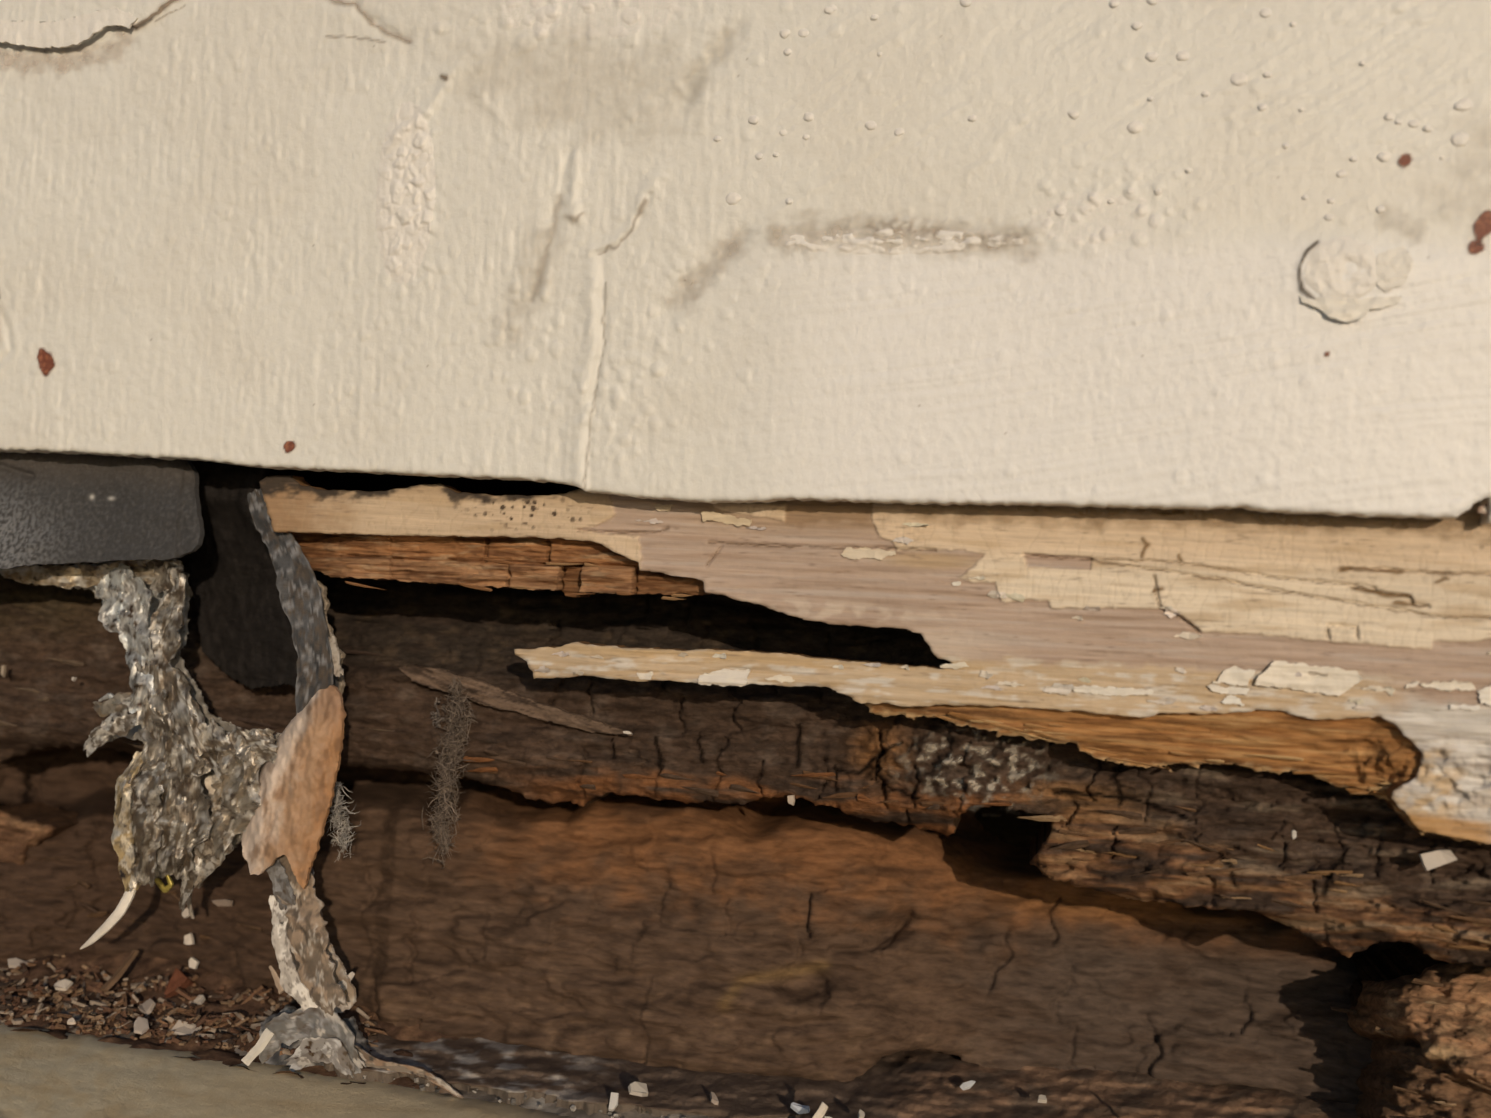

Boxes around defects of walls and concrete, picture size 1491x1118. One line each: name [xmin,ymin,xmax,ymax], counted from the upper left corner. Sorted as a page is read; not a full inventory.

crack [0,0,176,49]
crack [332,0,410,42]
corrosion [1398,154,1412,166]
corrosion [1469,210,1491,254]
corrosion [37,348,55,376]
corrosion [283,441,295,453]
crack [1141,511,1182,592]
crack [1334,567,1449,612]
peeling [698,653,795,687]
spalling [865,661,1491,845]
peeling [182,908,199,969]
peeling [608,1082,648,1111]